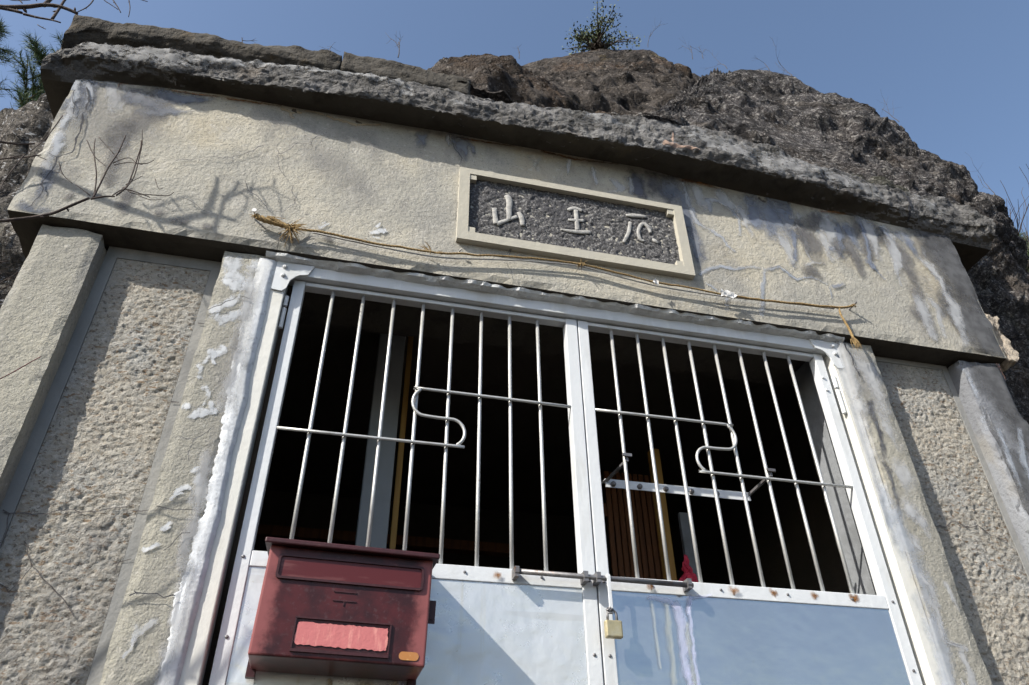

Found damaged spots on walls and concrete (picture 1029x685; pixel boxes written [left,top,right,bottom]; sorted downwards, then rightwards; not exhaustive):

water stain [20,81,208,213]
peeling [181,345,227,419]
water stain [613,172,1029,515]
peeling [142,521,171,552]
peeling [170,466,200,501]
water stain [836,345,926,553]
peeling [123,620,154,658]
water stain [914,567,976,685]